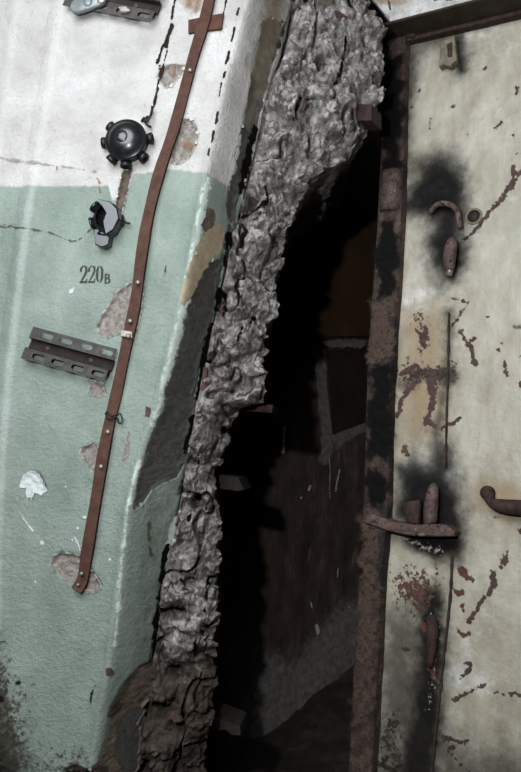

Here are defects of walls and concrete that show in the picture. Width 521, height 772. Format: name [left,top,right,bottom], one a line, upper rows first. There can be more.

crack [0,157,72,170]
crack [0,224,90,242]
spalling [65,0,389,772]
rust [366,294,398,364]
rust [395,297,478,431]
flaking render [19,471,47,501]
flaking render [49,526,81,582]
rust [452,550,509,638]
rust [351,509,444,772]
leakage [0,641,88,772]
rust [451,683,487,702]
rust [442,735,469,770]